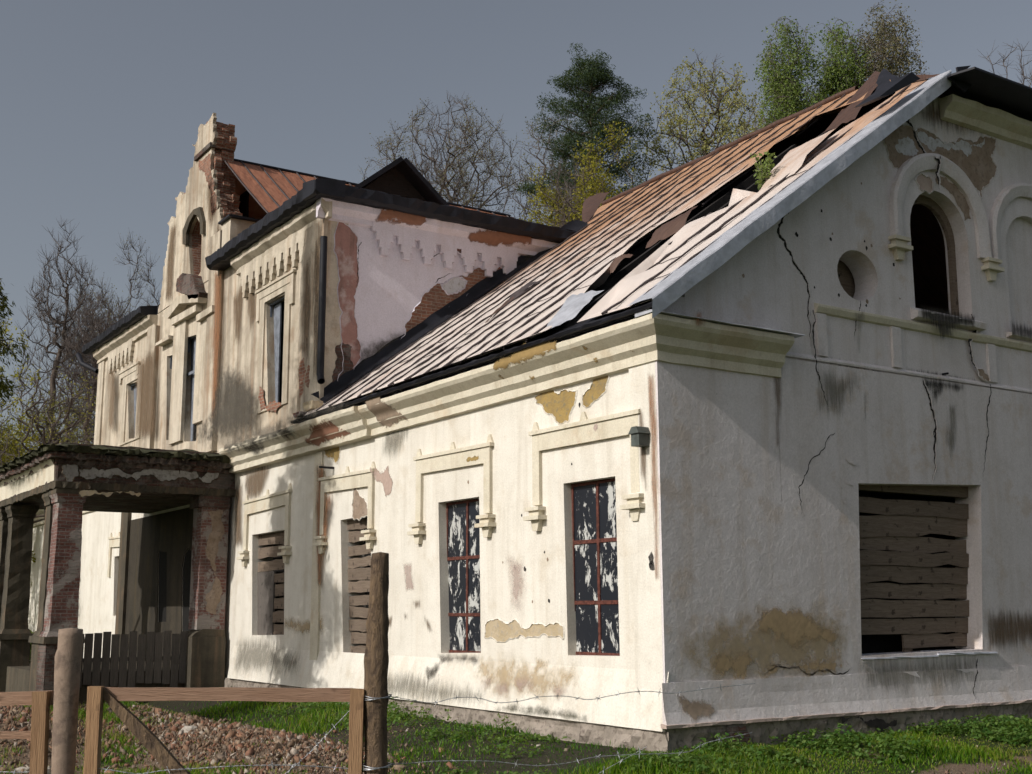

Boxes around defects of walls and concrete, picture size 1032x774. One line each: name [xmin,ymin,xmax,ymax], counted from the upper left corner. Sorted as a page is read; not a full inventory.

flaking render [883,124,997,199]
flaking render [332,222,361,383]
flaking render [403,229,532,337]
crack [777,213,828,405]
peeling [62,464,219,497]
damp [195,372,342,451]
flaking render [305,420,350,464]
flaking render [535,375,610,425]
crack [798,433,835,509]
crack [923,380,938,481]
crack [968,314,991,472]
peeling [484,617,565,643]